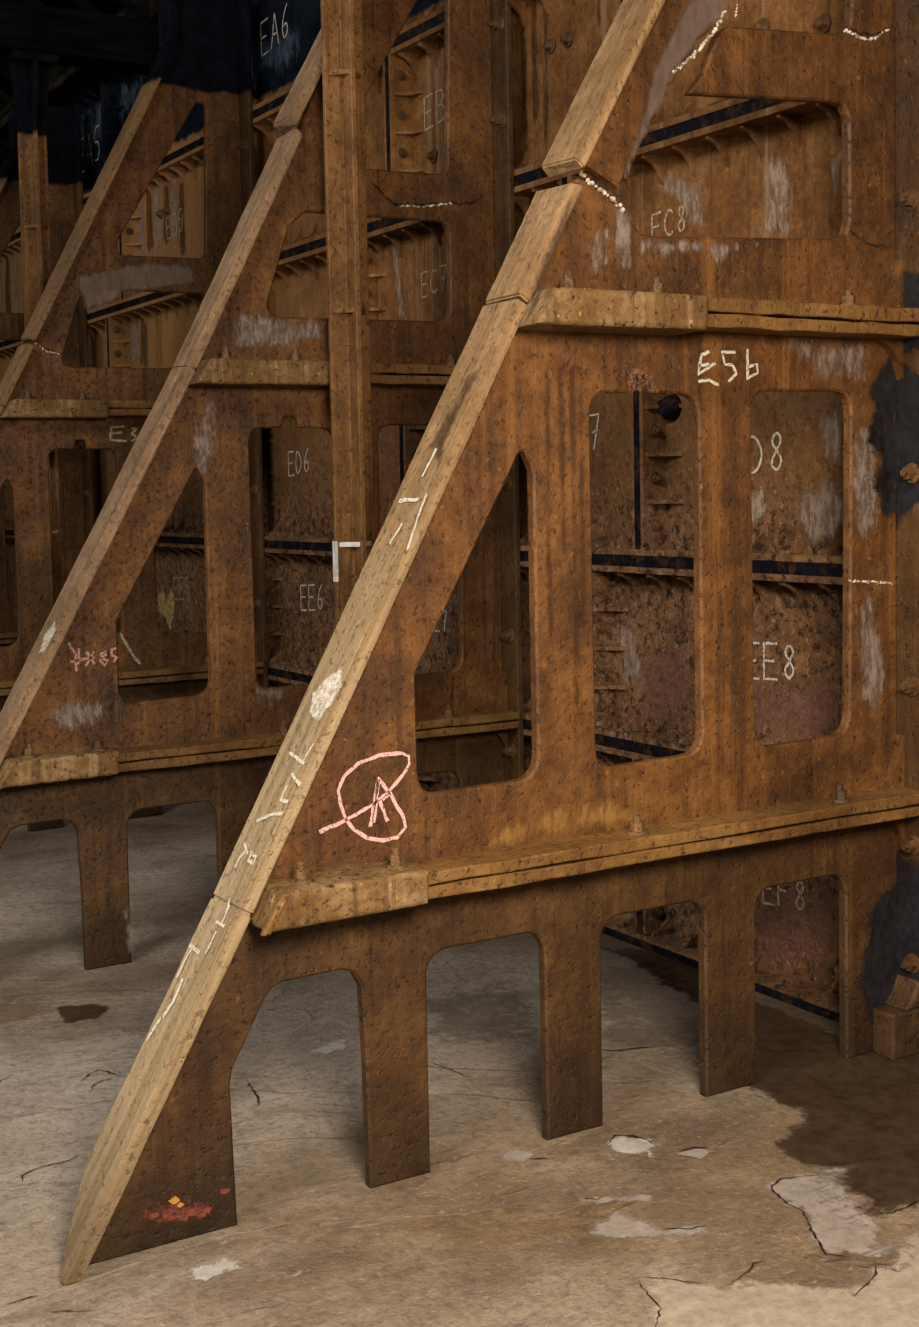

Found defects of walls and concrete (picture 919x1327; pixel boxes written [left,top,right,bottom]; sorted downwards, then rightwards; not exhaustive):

leakage [0,999,108,1023]
leakage [747,1002,919,1215]
spalling [608,1134,653,1157]
crack [21,1155,78,1181]
spalling [582,1194,709,1238]
spalling [639,1167,919,1327]
crack [635,1260,766,1285]
crack [853,1262,899,1296]